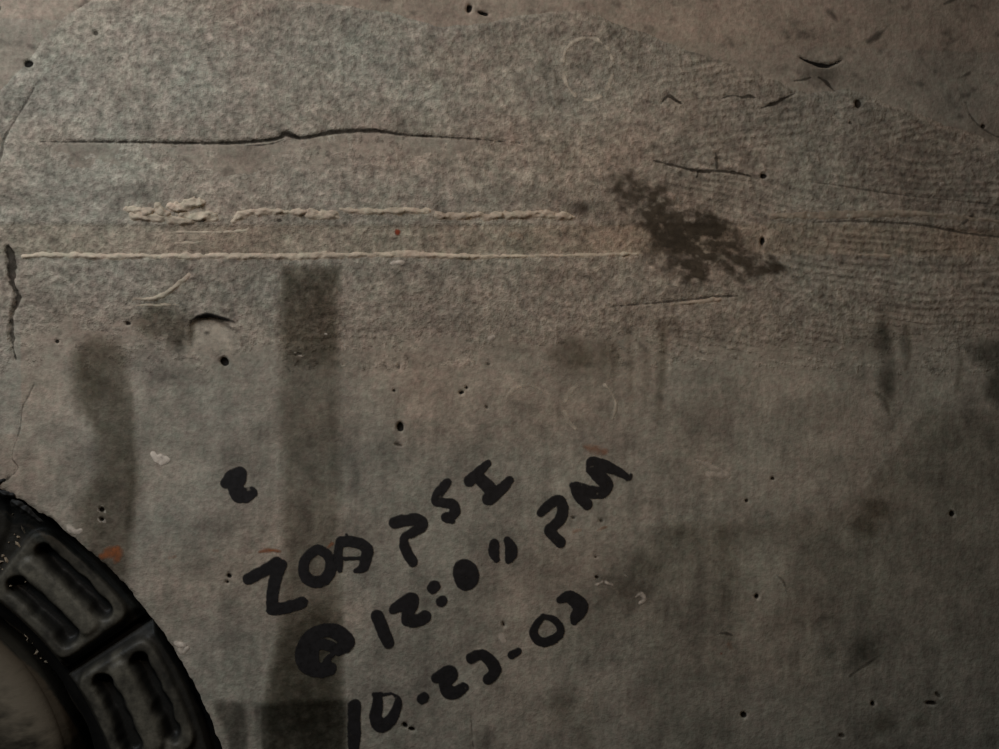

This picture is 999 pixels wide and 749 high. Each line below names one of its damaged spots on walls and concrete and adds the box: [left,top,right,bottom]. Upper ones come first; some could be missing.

crack [71,128,502,145]
crack [654,153,750,177]
crack [5,245,22,359]